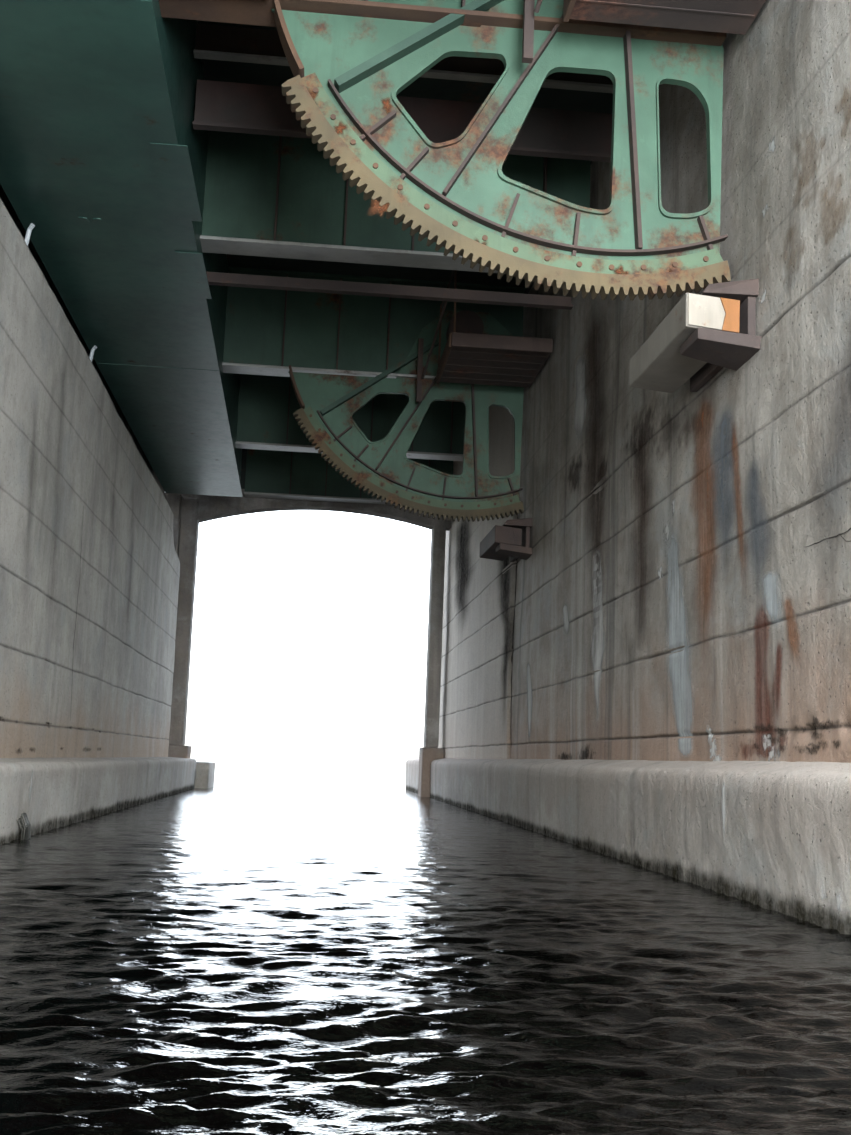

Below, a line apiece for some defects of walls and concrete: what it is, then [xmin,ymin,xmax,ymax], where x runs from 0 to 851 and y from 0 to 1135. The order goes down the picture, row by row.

damp [456,522,470,610]
damp [500,556,513,697]
damp [569,320,604,709]
rust [697,403,714,624]
rust [732,432,743,555]
rust [744,600,798,759]
damp [763,734,780,761]
crack [806,528,851,547]